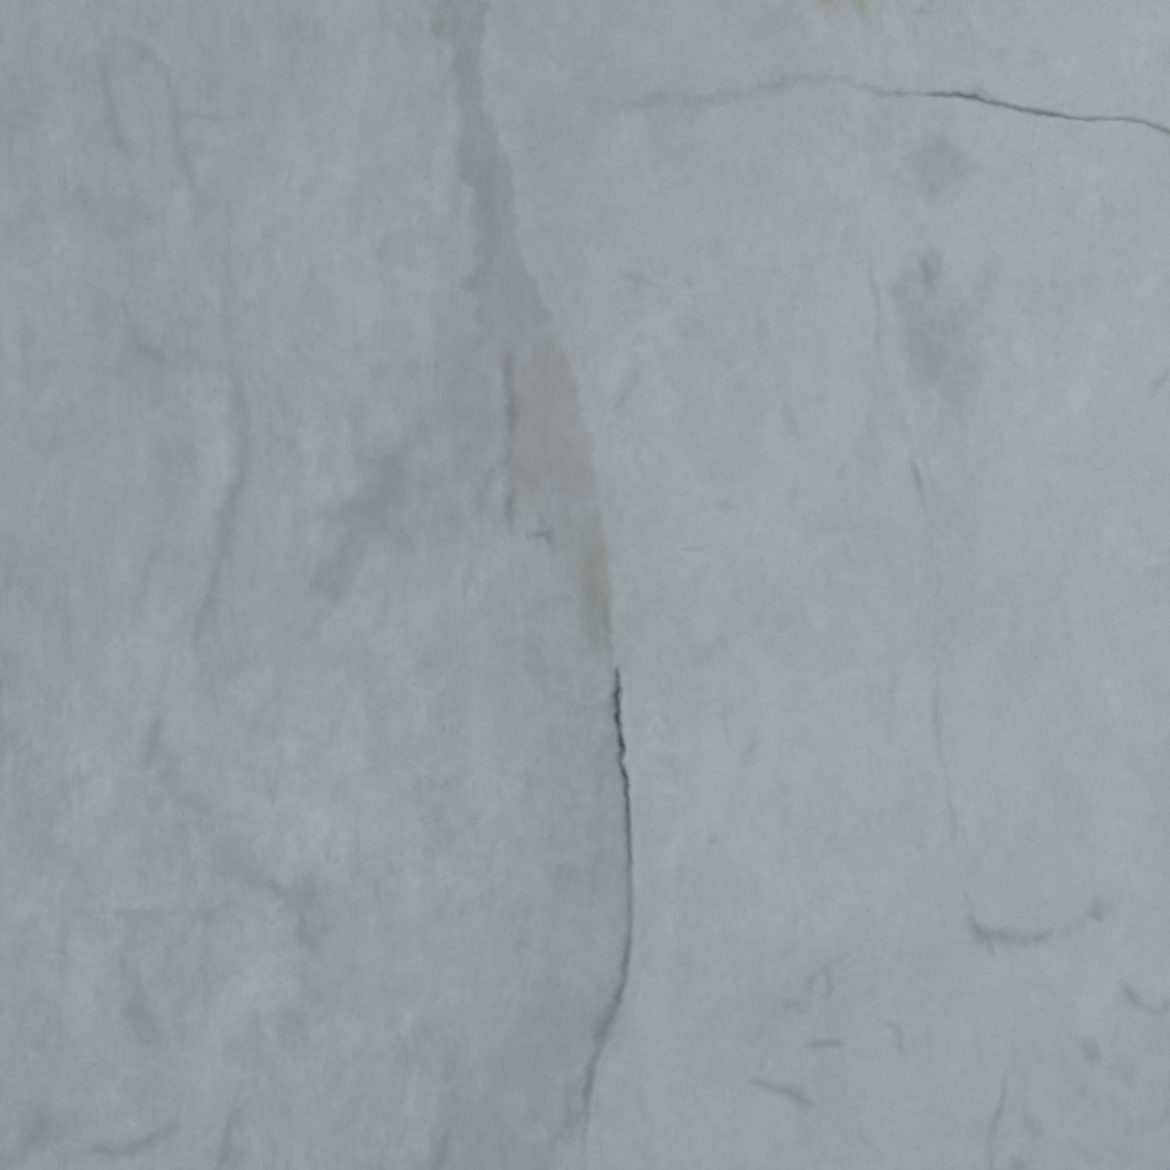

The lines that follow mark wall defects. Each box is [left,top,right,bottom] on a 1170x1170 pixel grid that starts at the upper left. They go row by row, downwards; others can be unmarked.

crack [589,64,1170,141]
crack [575,665,646,1170]